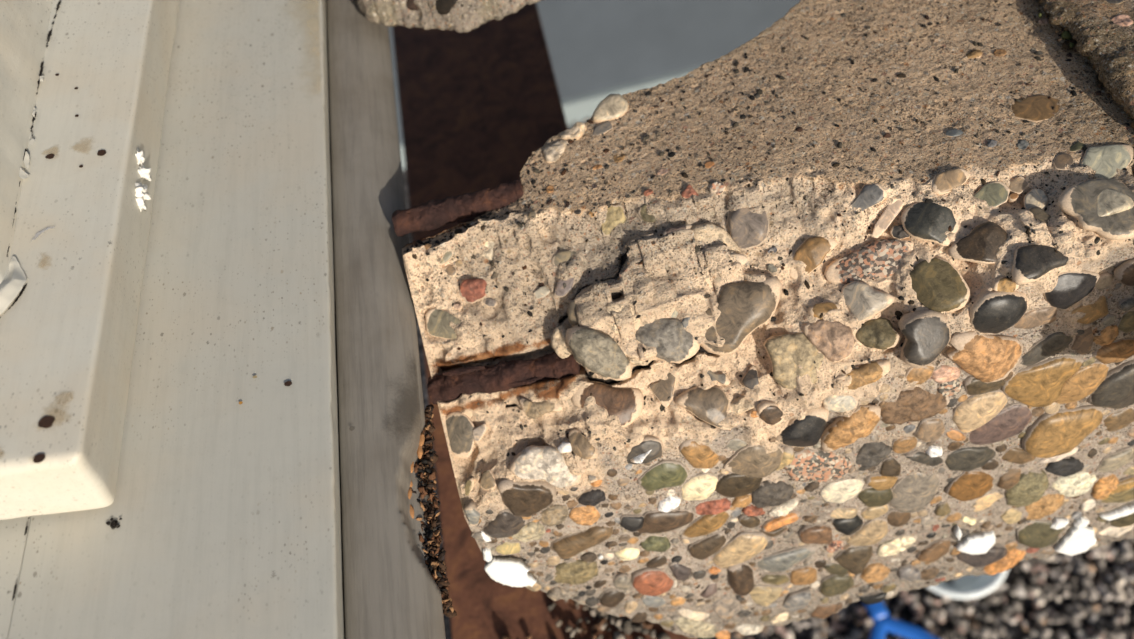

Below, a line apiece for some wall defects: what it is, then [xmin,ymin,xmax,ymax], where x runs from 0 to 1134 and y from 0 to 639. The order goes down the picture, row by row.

crack [1038,0,1111,95]
spalling [1112,148,1134,192]
peeling [0,256,27,318]
spalling [403,158,1101,481]
corrosion [433,339,551,373]
corrosion [441,366,585,414]
peeling [481,531,537,587]